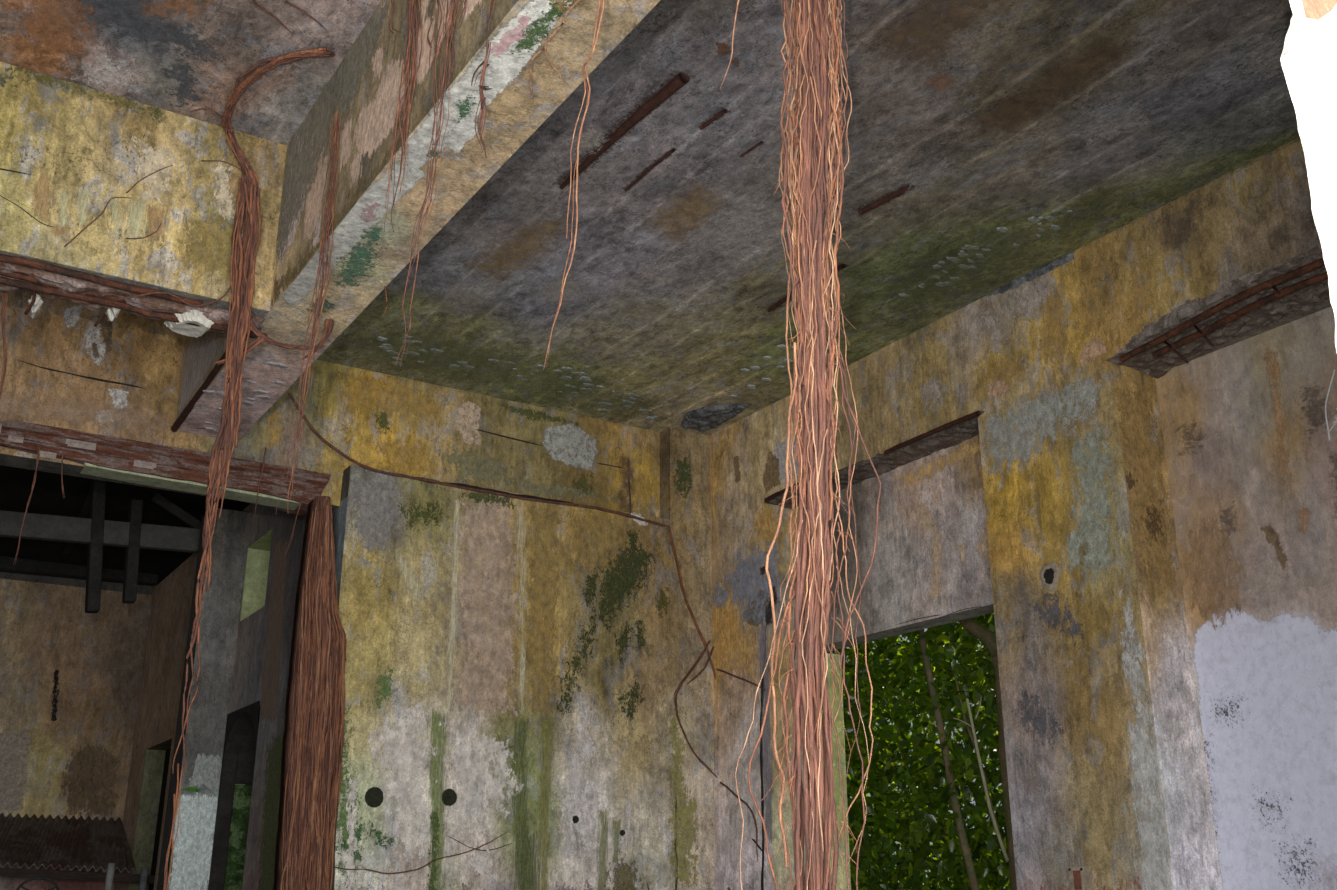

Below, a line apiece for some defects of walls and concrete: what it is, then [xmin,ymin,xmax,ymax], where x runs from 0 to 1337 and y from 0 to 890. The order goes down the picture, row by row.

spalling [0,254,230,368]
peeling [96,388,129,423]
spalling [171,351,226,432]
spalling [829,243,1330,591]
damp [361,435,657,717]